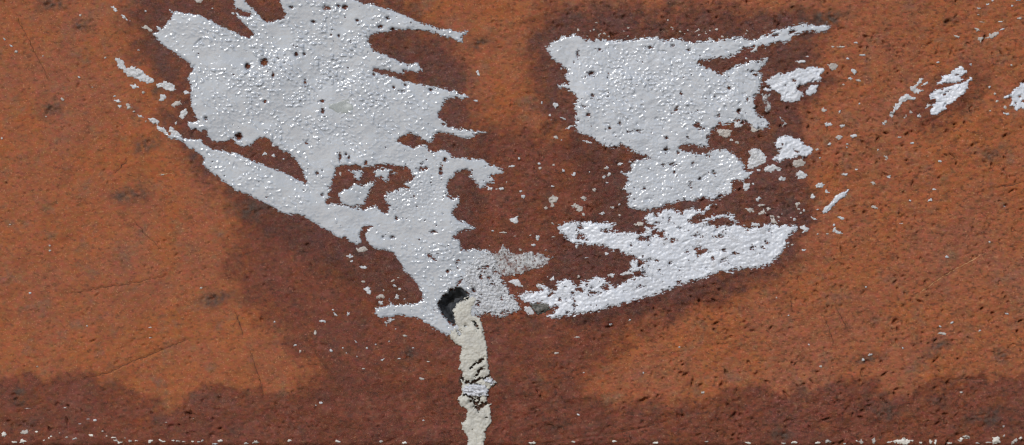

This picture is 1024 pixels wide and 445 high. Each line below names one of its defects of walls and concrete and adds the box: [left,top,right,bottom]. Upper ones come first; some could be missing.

water stain [129,0,323,191]
water stain [0,187,468,445]
peeling [113,0,865,336]
water stain [320,0,1024,445]
peeling [884,63,972,123]
peeling [989,82,1024,115]